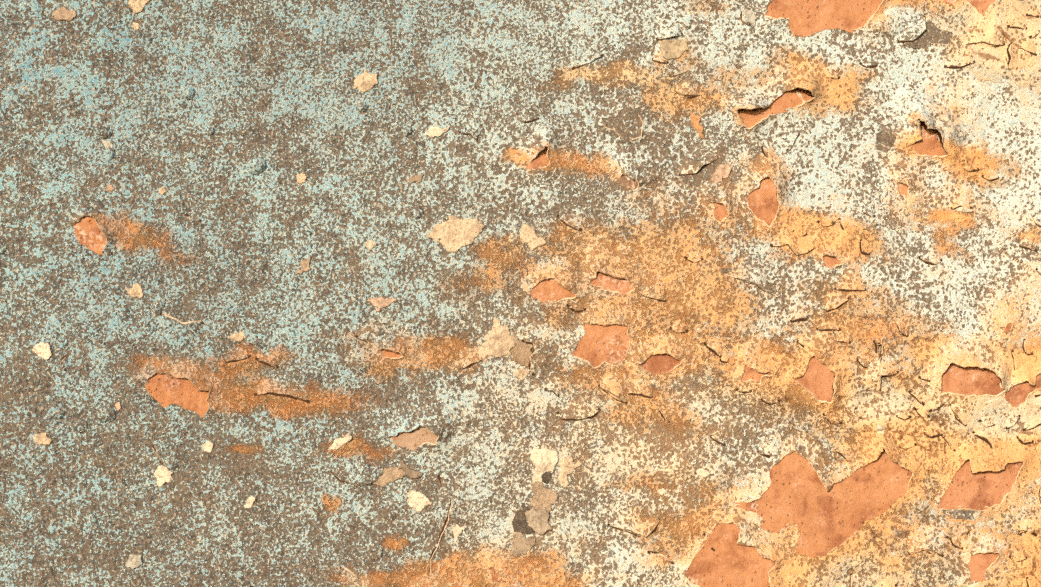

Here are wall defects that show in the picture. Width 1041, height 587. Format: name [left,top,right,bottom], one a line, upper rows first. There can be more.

peeling [743,0,895,44]
peeling [593,58,835,241]
peeling [875,80,987,214]
peeling [60,185,134,262]
peeling [520,224,546,251]
peeling [514,232,699,381]
peeling [130,353,230,424]
peeling [926,300,1041,413]
peeling [202,441,214,453]
peeling [675,425,1041,587]
peeling [407,574,470,587]